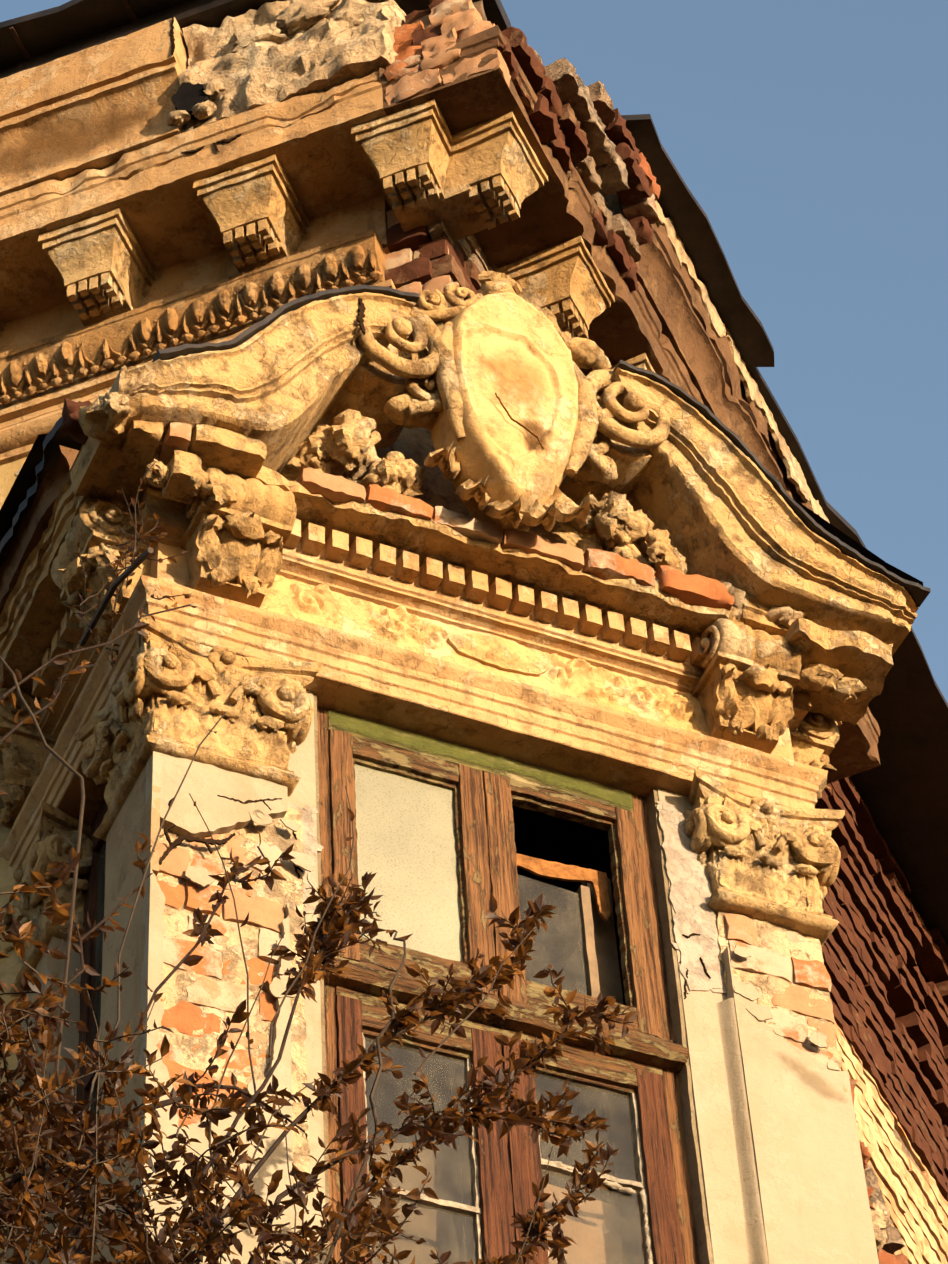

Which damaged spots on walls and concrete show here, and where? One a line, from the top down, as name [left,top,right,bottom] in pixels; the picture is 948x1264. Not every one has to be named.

crack [495,392,544,450]
crack [217,795,282,810]
crack [159,824,236,865]
crack [293,831,304,878]
spalling [656,800,857,1117]
spalling [156,801,324,1188]
spalling [859,1140,909,1264]